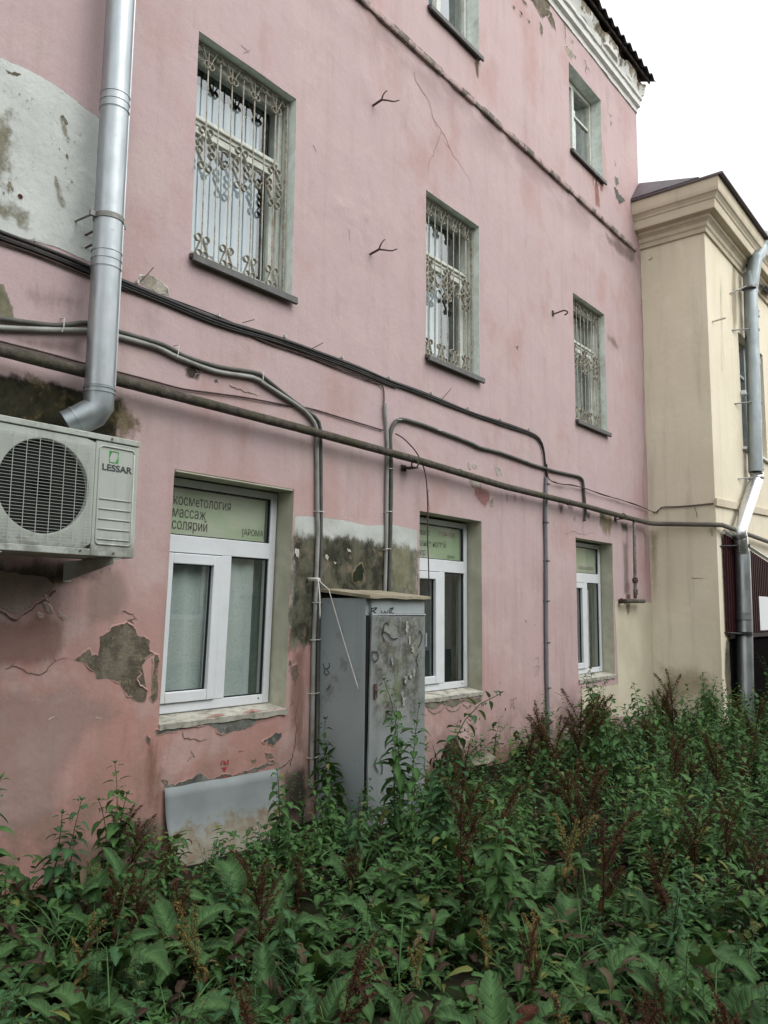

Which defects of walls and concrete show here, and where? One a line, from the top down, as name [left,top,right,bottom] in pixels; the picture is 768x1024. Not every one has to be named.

spalling [512,0,576,60]
spalling [353,564,364,583]
spalling [74,621,161,704]
spalling [145,708,283,746]
spalling [160,732,282,788]